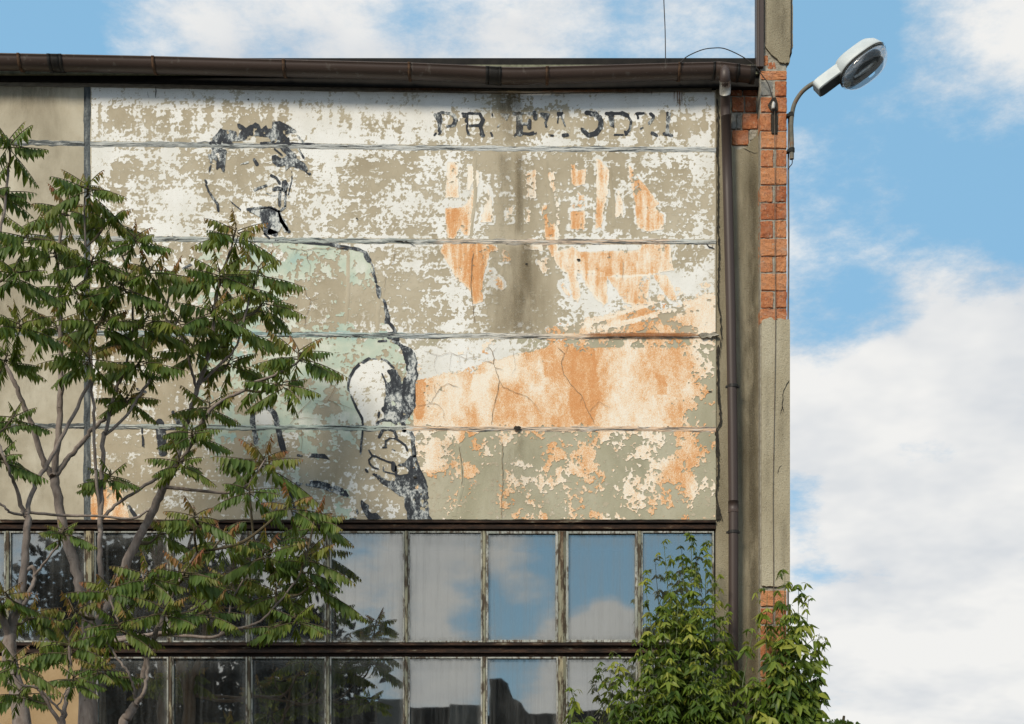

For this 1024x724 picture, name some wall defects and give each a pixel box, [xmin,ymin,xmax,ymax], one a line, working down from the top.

spalling [730,55,787,327]
peeling [91,87,715,519]
crack [418,348,538,518]
crack [560,345,604,424]
spalling [759,591,787,688]